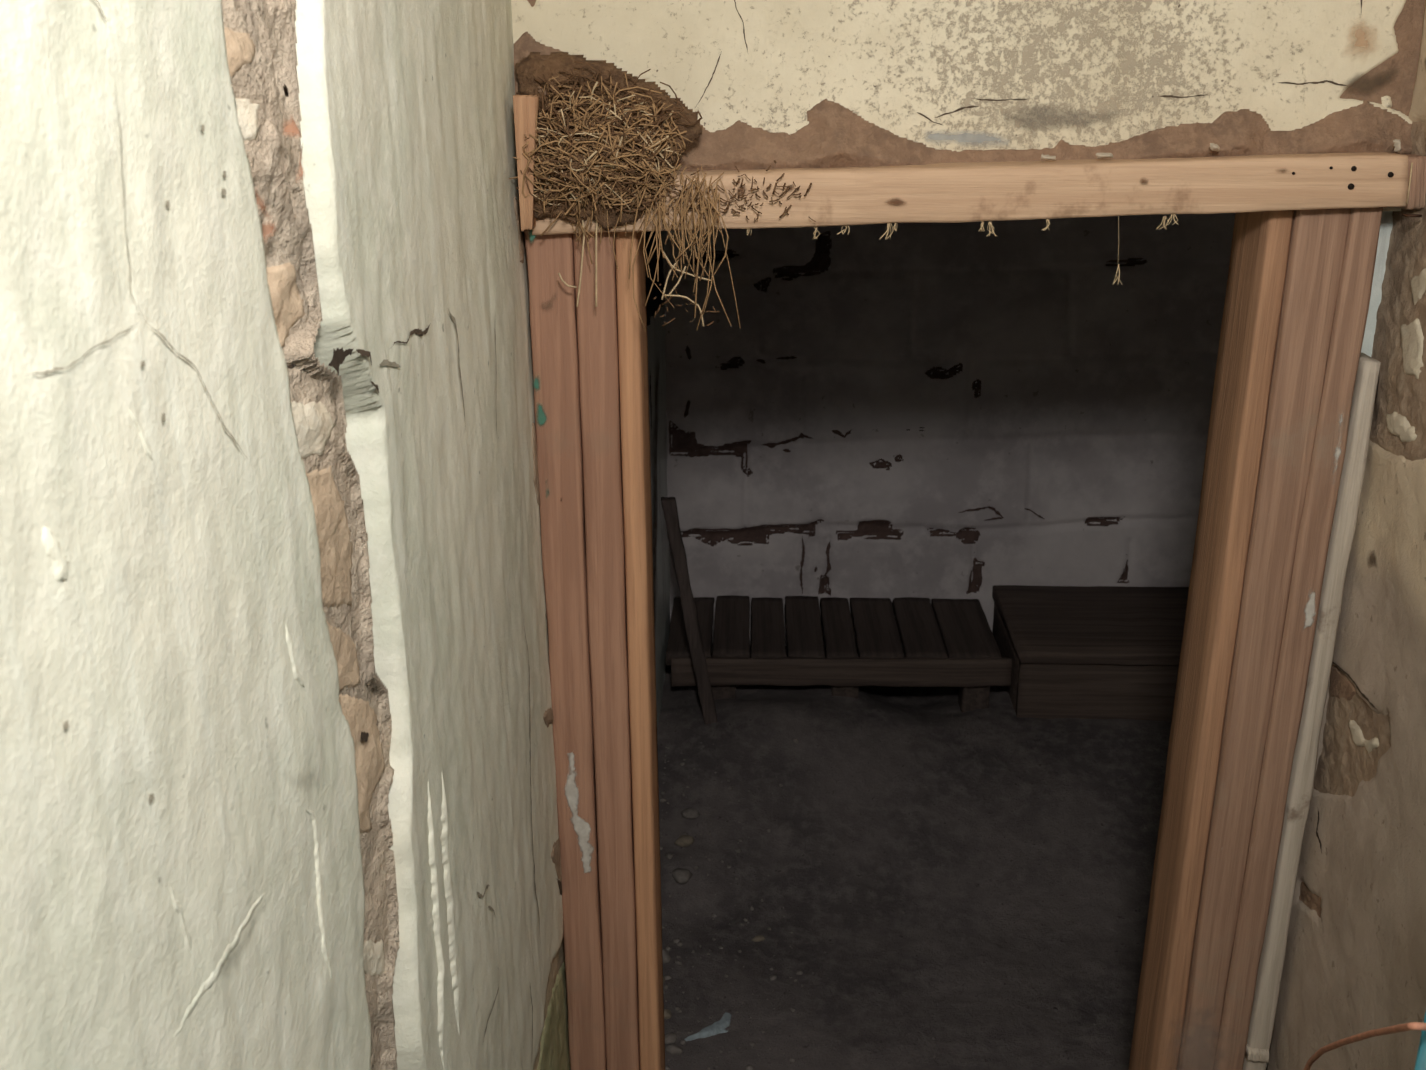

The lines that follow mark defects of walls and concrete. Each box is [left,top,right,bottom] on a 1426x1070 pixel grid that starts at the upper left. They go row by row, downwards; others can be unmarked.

peeling [1340,0,1426,156]
crack [24,92,247,458]
crack [287,309,497,431]
peeling [754,231,832,292]
flaking render [1370,193,1426,461]
peeling [669,421,753,477]
flaking render [221,0,400,1070]
peeling [681,519,904,547]
peeling [927,527,985,594]
peeling [1085,517,1124,526]
flaking render [1314,665,1391,797]
flaking render [1299,882,1322,918]